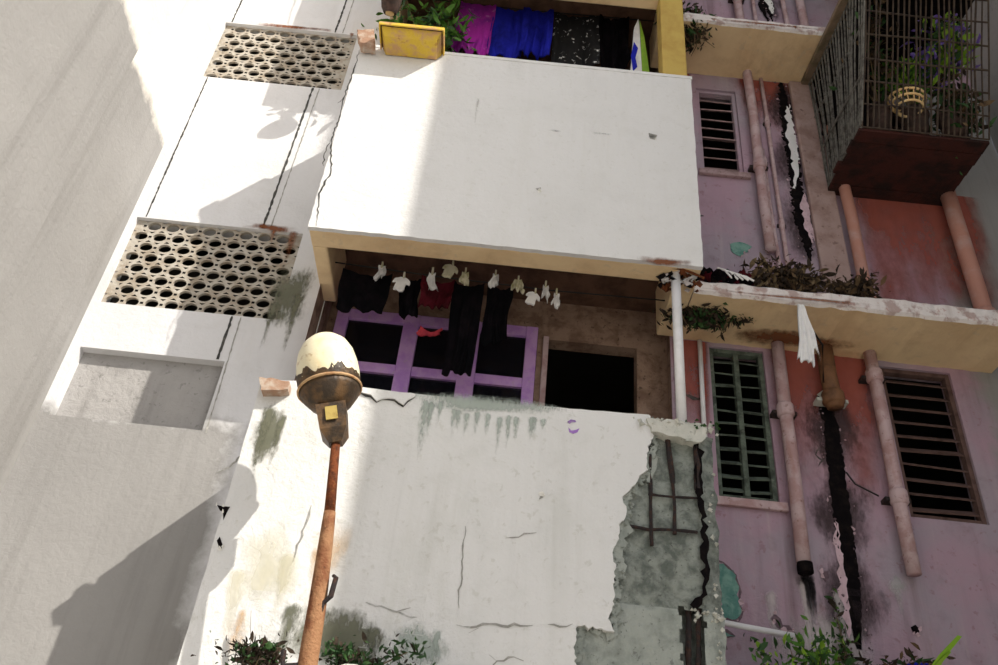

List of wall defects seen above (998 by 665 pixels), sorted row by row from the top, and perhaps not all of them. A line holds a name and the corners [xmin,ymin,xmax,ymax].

crack [316,55,358,224]
leakage [255,408,287,463]
leakage [421,396,553,435]
crack [458,526,572,633]
spalling [574,417,744,665]
crack [491,656,523,665]